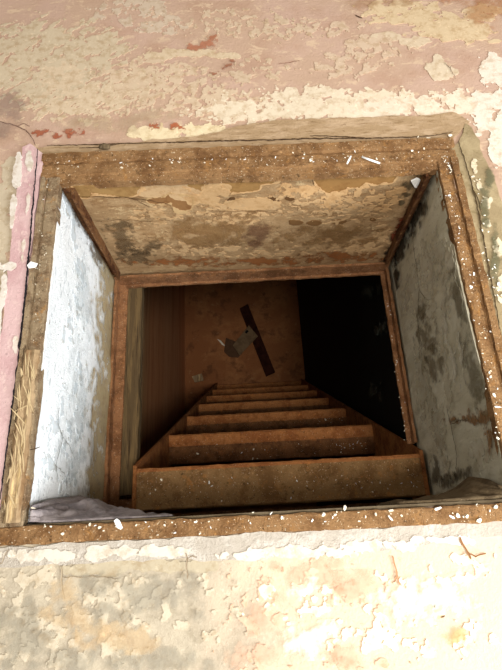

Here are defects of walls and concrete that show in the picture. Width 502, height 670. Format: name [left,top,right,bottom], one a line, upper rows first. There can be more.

peeling [0,0,502,169]
peeling [0,151,38,335]
leakage [107,222,162,265]
spalling [70,176,406,259]
leakage [173,215,387,249]
leakage [382,191,470,488]
spalling [0,535,476,670]
spalling [428,553,491,587]